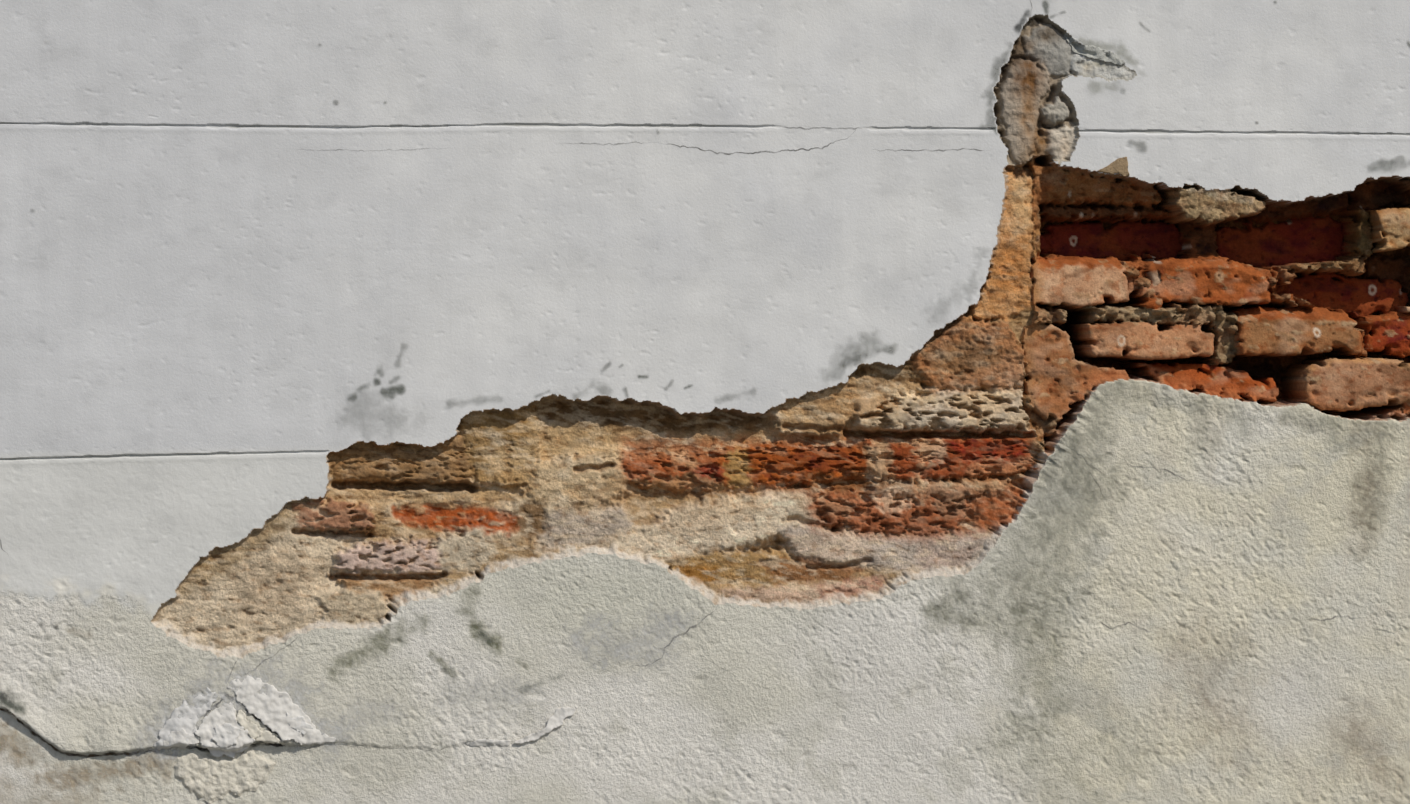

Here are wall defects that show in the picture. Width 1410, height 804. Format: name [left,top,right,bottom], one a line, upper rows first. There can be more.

flaking render [151,14,1410,659]
crack [0,673,284,758]